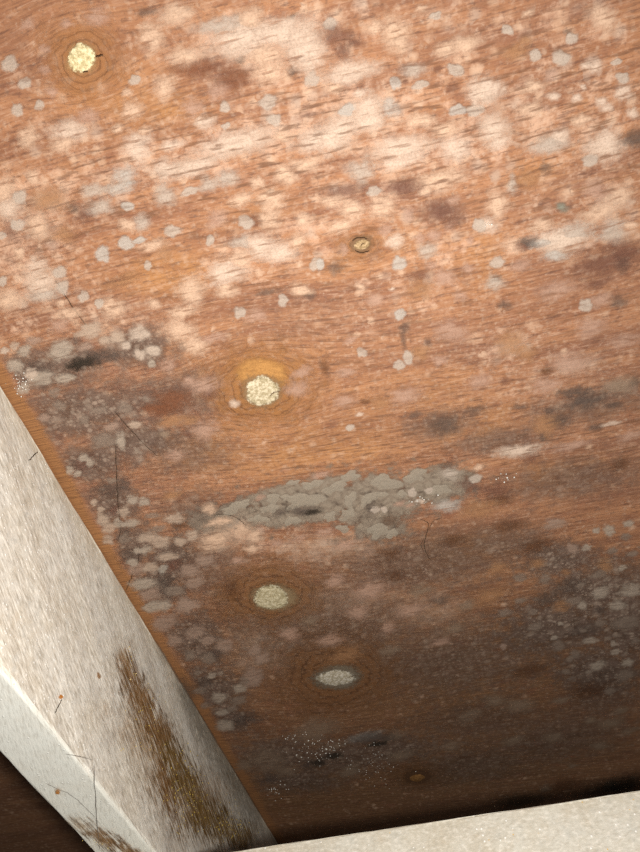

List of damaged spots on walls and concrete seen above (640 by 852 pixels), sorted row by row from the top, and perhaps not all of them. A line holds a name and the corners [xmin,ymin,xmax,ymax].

water stain [202,9,319,86]
water stain [154,123,259,202]
water stain [277,91,393,183]
water stain [450,81,506,149]
water stain [14,249,77,329]
water stain [118,202,180,257]
water stain [213,236,304,297]
water stain [239,178,282,229]
water stain [473,196,506,232]
water stain [504,186,637,260]
water stain [0,277,482,731]
water stain [500,544,640,694]